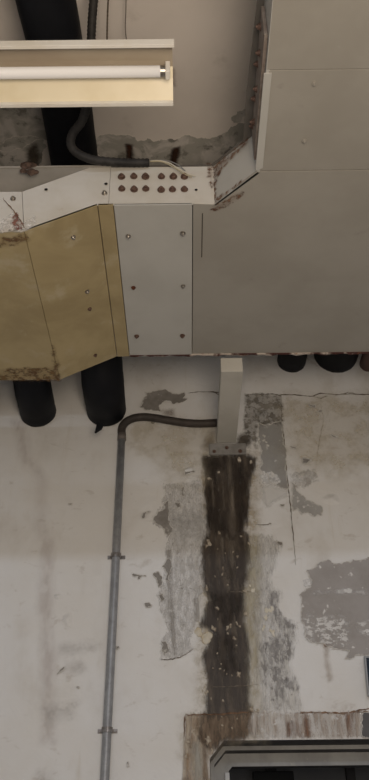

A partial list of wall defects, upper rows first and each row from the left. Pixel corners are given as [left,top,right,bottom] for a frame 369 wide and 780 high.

peeling [96,109,245,167]
peeling [140,389,188,412]
peeling [132,470,206,660]
water stain [189,455,260,755]
peeling [257,421,323,517]
crack [286,465,296,565]
crack [247,392,369,470]
peeling [247,535,369,711]